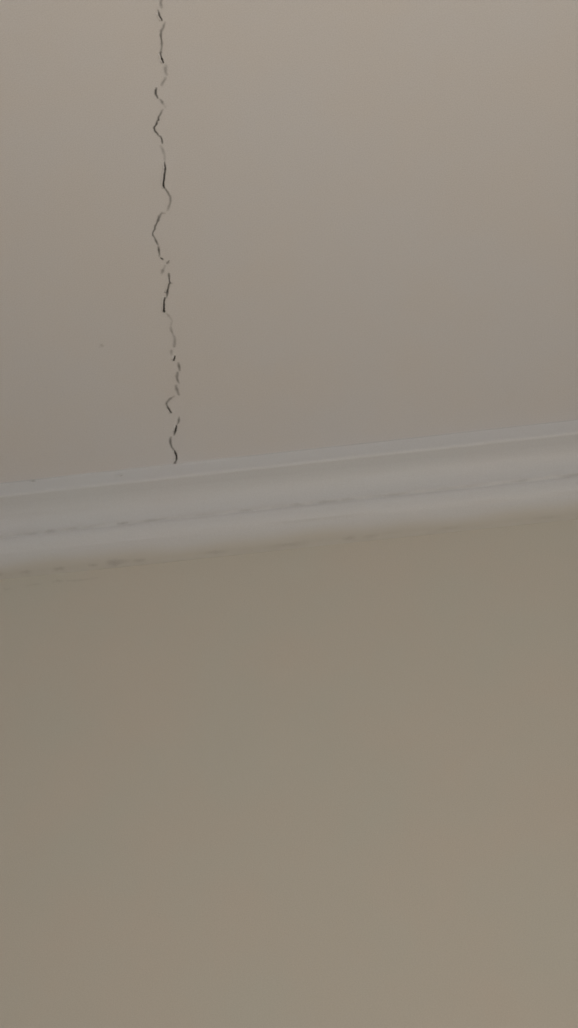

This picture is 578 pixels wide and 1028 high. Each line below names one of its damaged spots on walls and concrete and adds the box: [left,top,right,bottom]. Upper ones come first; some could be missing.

crack [154,89,166,189]
crack [154,229,170,313]
crack [166,406,177,464]